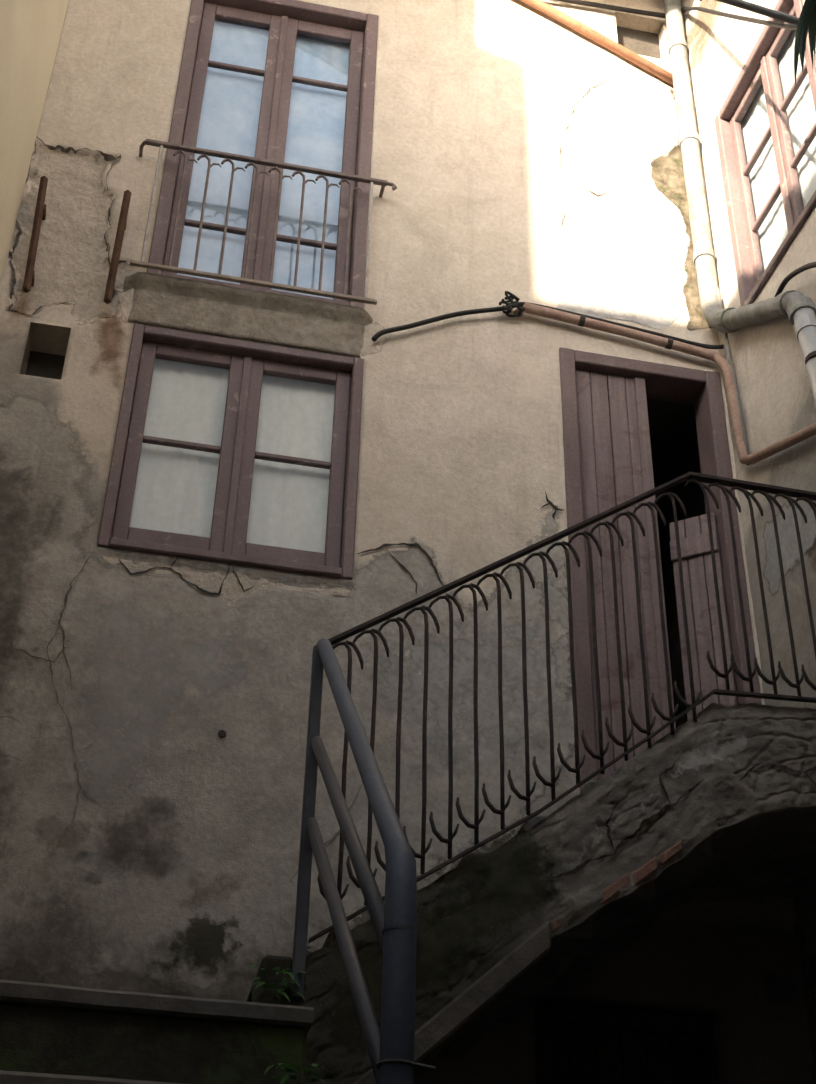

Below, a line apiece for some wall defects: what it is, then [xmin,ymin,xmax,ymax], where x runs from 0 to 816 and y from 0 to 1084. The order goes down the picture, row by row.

spalling [5,136,138,325]
rust [100,315,123,368]
spalling [360,323,391,356]
damp [0,471,29,666]
crack [118,557,254,595]
crack [0,556,100,857]
flaking render [0,395,575,992]